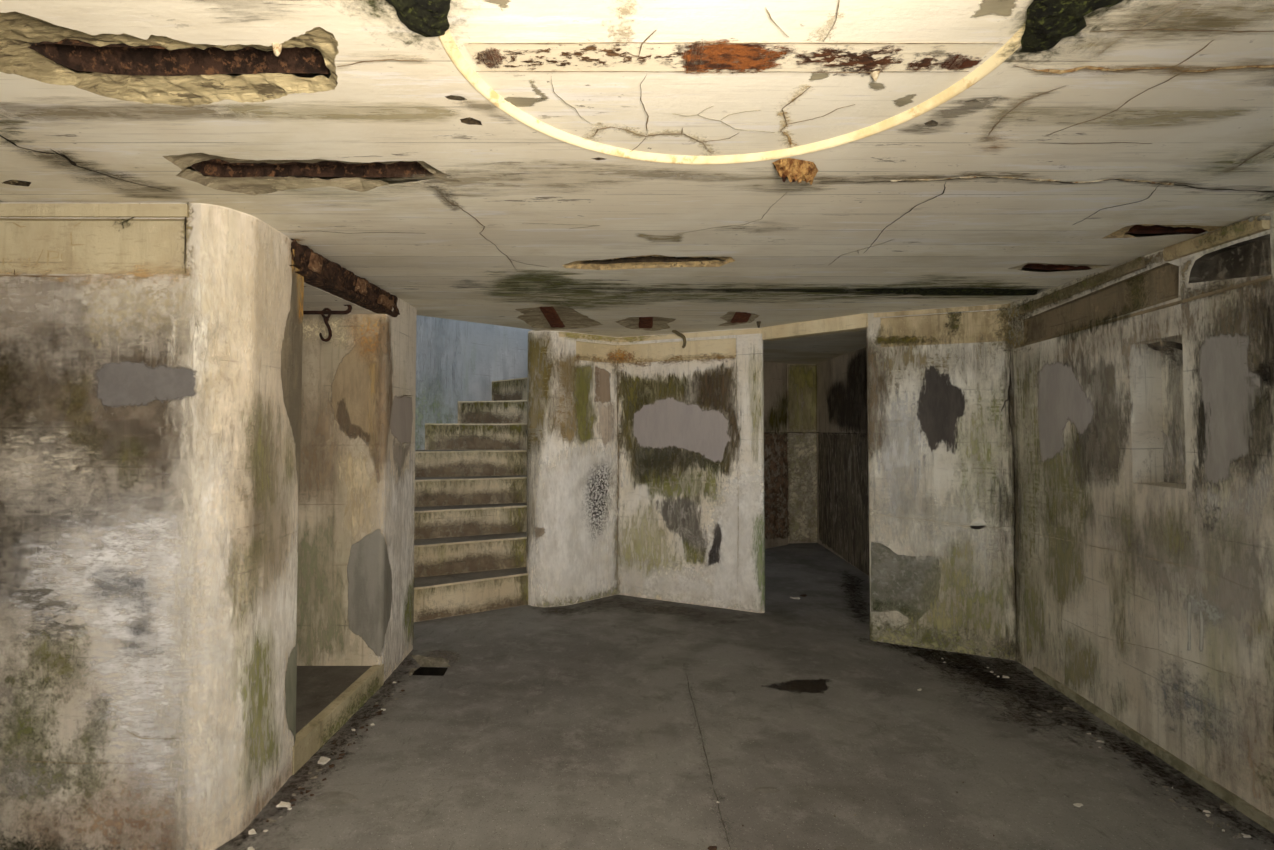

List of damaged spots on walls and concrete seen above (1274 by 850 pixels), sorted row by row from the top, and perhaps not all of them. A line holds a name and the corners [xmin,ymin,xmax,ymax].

spalling [0,11,339,107]
corrosion [475,38,981,76]
crack [476,0,1274,155]
spalling [163,153,461,195]
crack [675,144,1274,263]
corrosion [286,239,323,317]
spalling [562,255,735,270]
leakage [0,273,205,637]
flaking render [281,262,414,695]
leakage [96,568,154,656]
peeling [19,272,298,850]
spalling [870,542,941,624]